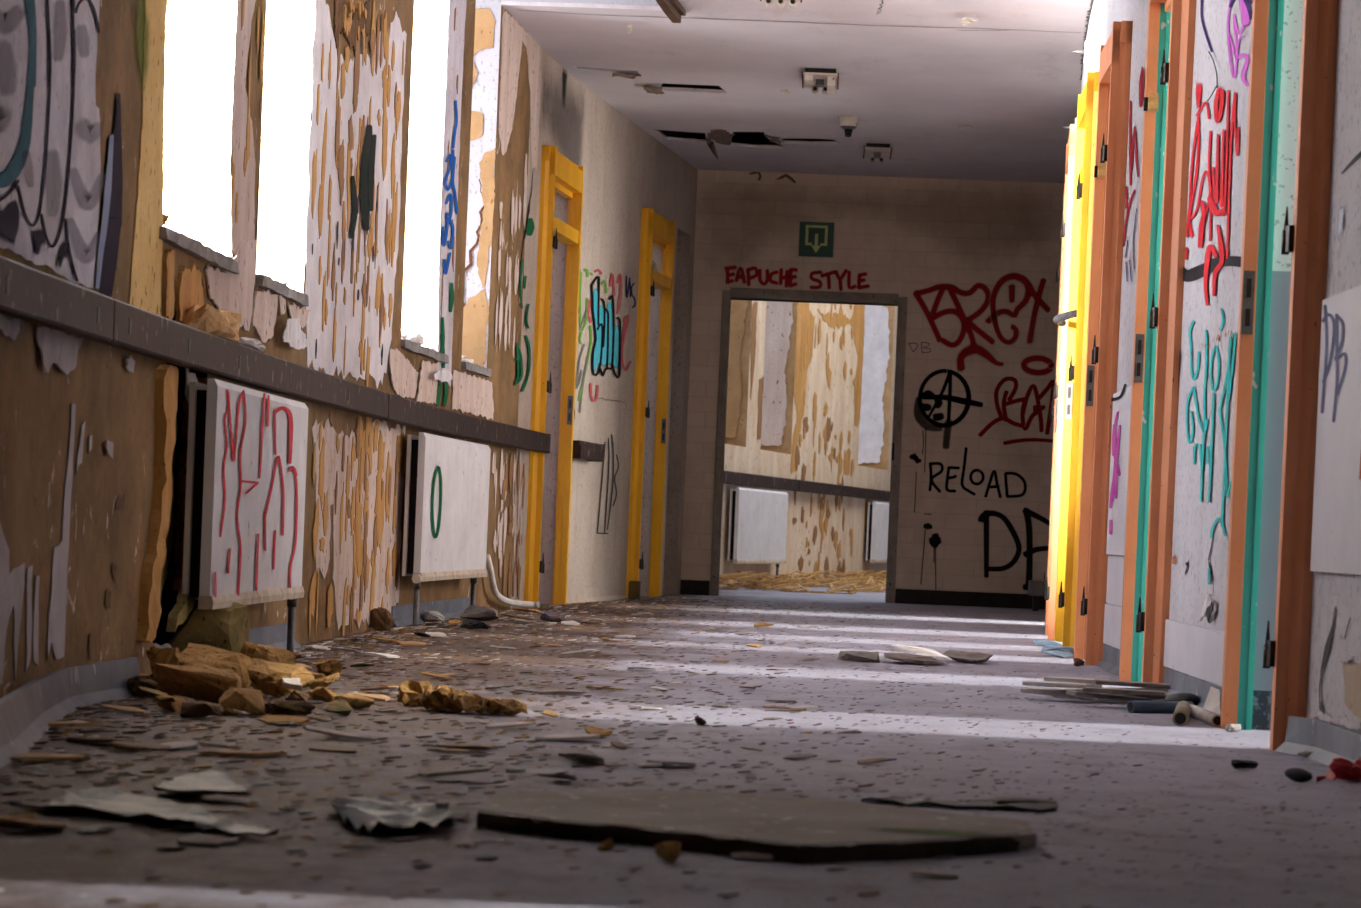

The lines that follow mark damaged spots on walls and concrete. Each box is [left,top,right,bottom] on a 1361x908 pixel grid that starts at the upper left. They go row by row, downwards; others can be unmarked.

peeling [128,0,542,420]
peeling [0,313,84,375]
peeling [125,355,135,373]
peeling [725,300,890,580]
peeling [0,403,114,685]
peeling [295,414,461,714]
peeling [491,448,603,629]
peeling [420,635,636,685]
peeling [1309,654,1361,729]